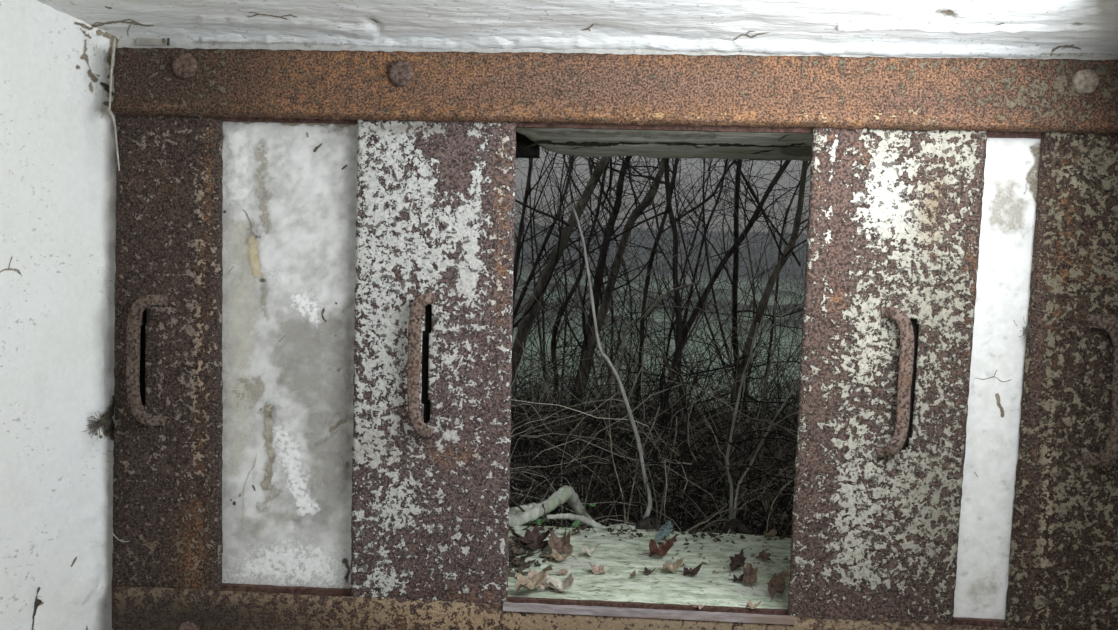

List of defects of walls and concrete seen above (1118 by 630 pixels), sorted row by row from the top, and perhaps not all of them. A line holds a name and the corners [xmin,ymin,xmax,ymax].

damp [226,128,271,232]
damp [225,222,353,517]
damp [228,540,348,588]